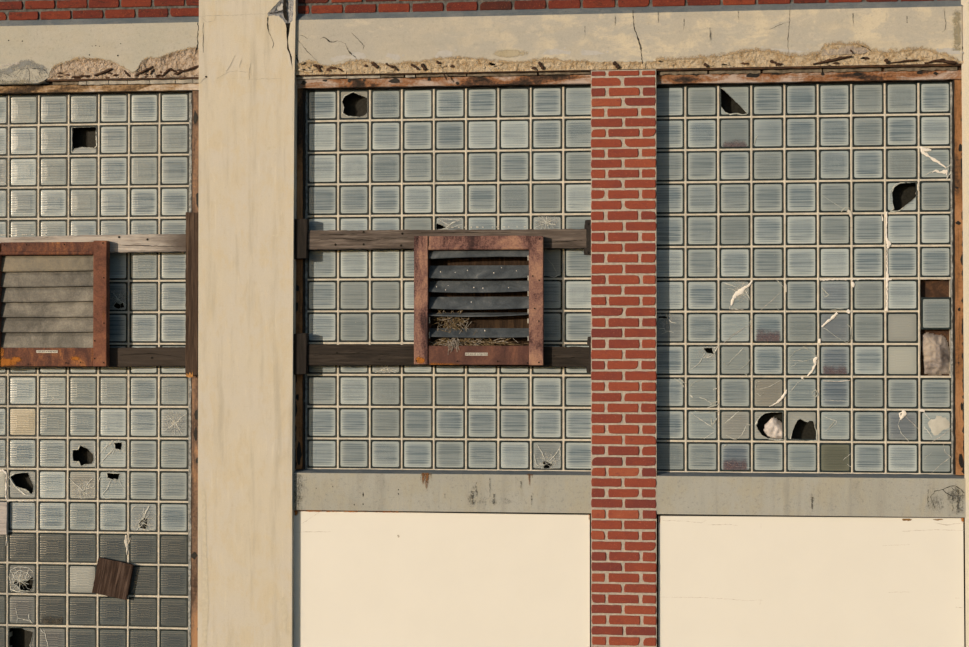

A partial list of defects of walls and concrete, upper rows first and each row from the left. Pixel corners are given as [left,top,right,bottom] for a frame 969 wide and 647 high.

crack [195,0,364,83]
spalling [47,43,207,79]
spalling [295,43,964,80]